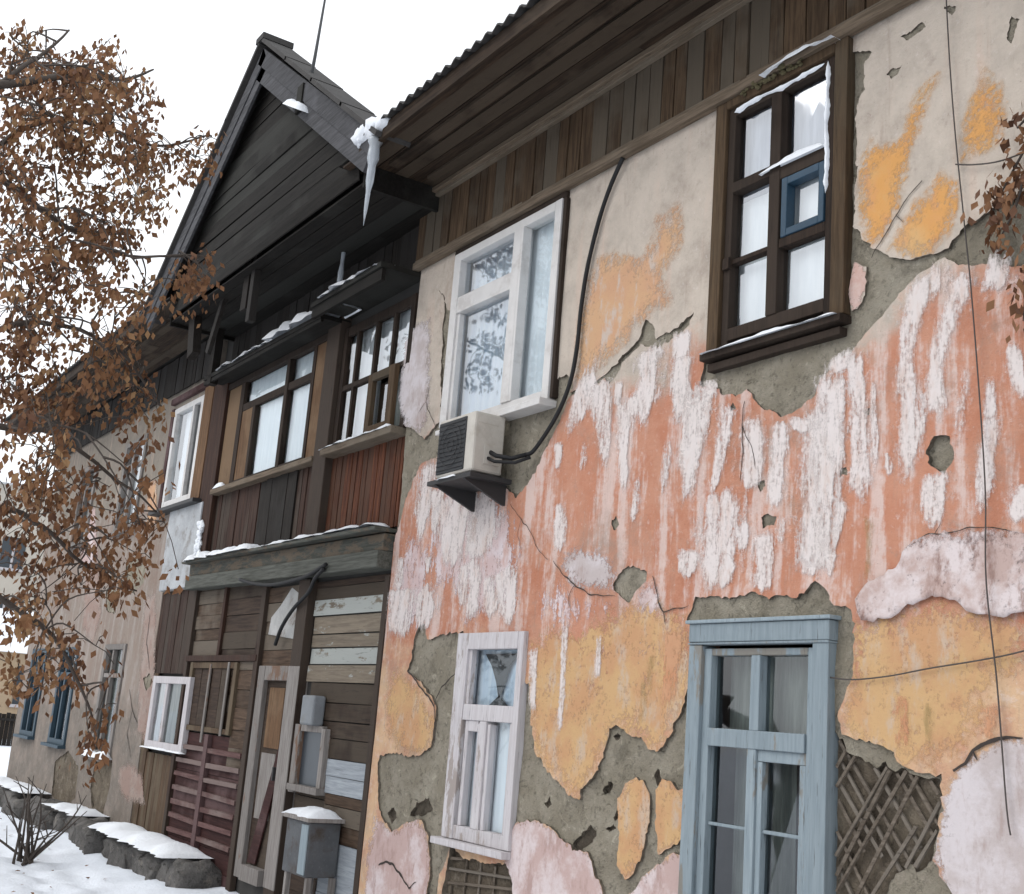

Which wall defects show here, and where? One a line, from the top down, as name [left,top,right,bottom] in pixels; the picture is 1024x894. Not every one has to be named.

spalling [365,624,464,894]
crack [510,504,615,606]
peeling [498,207,694,498]
crack [652,576,689,622]
peeling [469,566,1024,894]
spalling [699,51,1024,417]
spalling [926,435,954,474]
crack [953,736,1023,772]